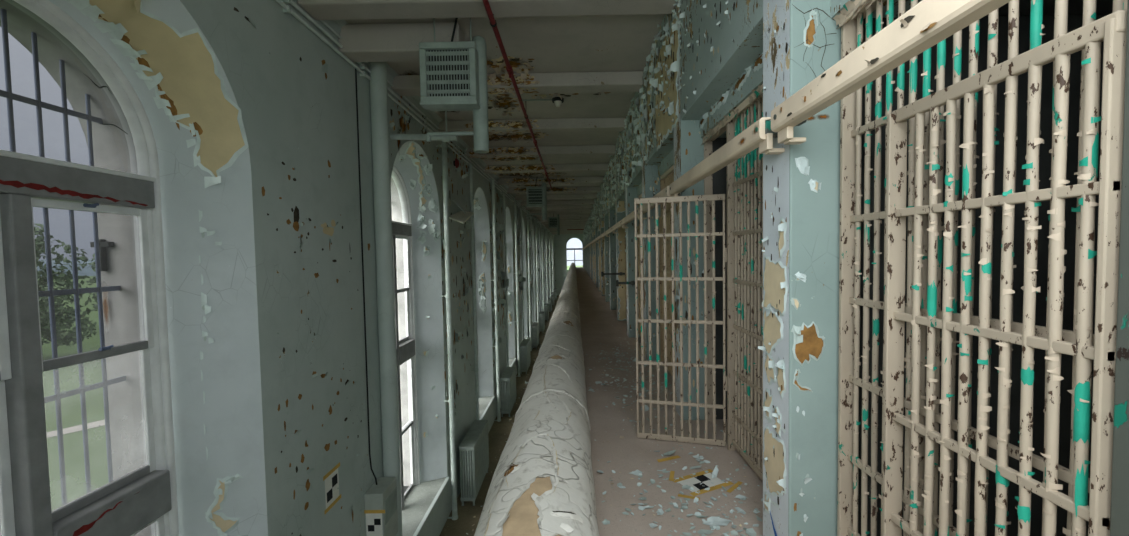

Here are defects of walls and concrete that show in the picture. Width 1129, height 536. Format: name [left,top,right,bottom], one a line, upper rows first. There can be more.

crack [792,4,837,77]
flaking render [65,0,249,188]
peeling [685,53,792,155]
peeling [389,56,578,422]
flaking render [583,0,737,400]
peeling [733,148,825,536]
peeling [205,474,243,536]
peeling [502,462,523,480]
peeling [500,475,564,536]